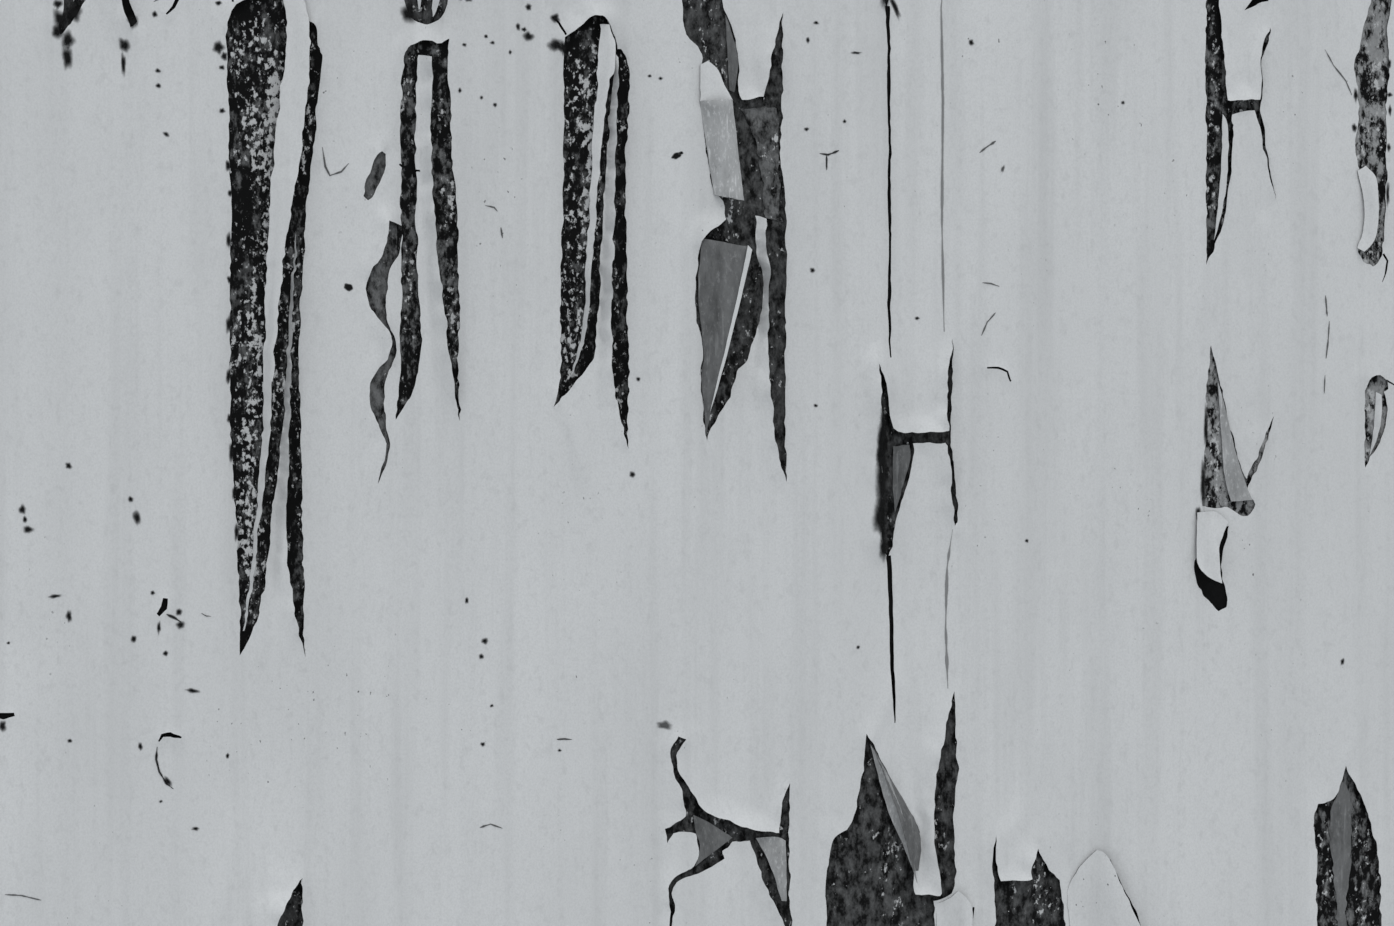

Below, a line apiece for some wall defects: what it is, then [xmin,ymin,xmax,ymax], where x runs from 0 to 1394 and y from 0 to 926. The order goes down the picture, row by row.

peeling [225,0,322,654]
peeling [344,0,461,482]
peeling [554,15,630,446]
peeling [682,0,787,480]
crack [885,2,893,357]
peeling [879,343,958,553]
peeling [1205,0,1273,263]
crack [886,550,895,723]
peeling [665,736,792,926]
peeling [825,694,973,926]
peeling [992,842,1065,926]
peeling [1314,767,1381,926]